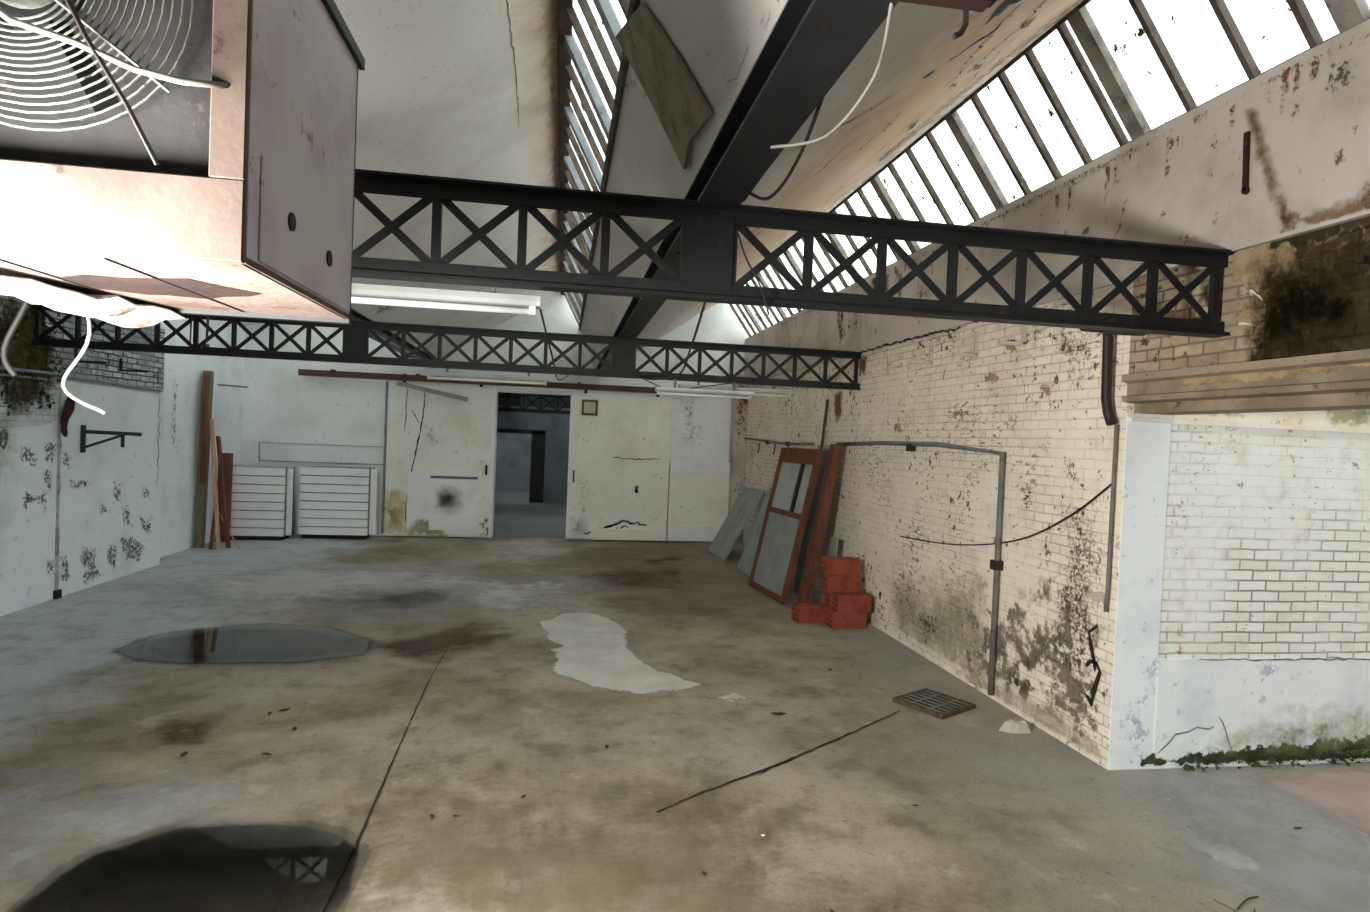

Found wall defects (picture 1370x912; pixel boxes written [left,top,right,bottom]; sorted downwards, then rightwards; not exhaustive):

water stain [1269,34,1369,90]
water stain [1305,191,1370,223]
peeling [0,429,88,510]
peeling [47,481,151,585]
water stain [961,509,1105,733]